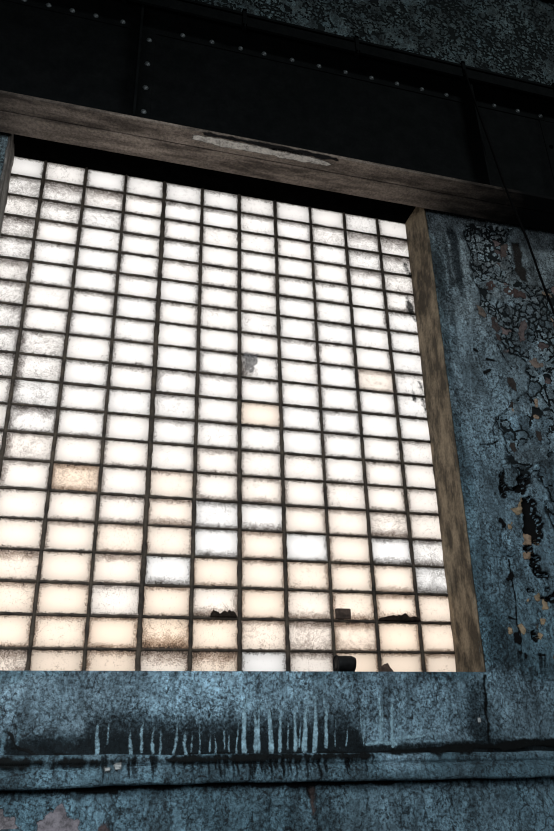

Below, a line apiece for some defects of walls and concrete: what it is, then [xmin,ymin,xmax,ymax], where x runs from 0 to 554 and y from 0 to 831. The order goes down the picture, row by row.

peeling [463,223,554,658]
damp [173,702,328,755]
peeling [0,802,80,831]